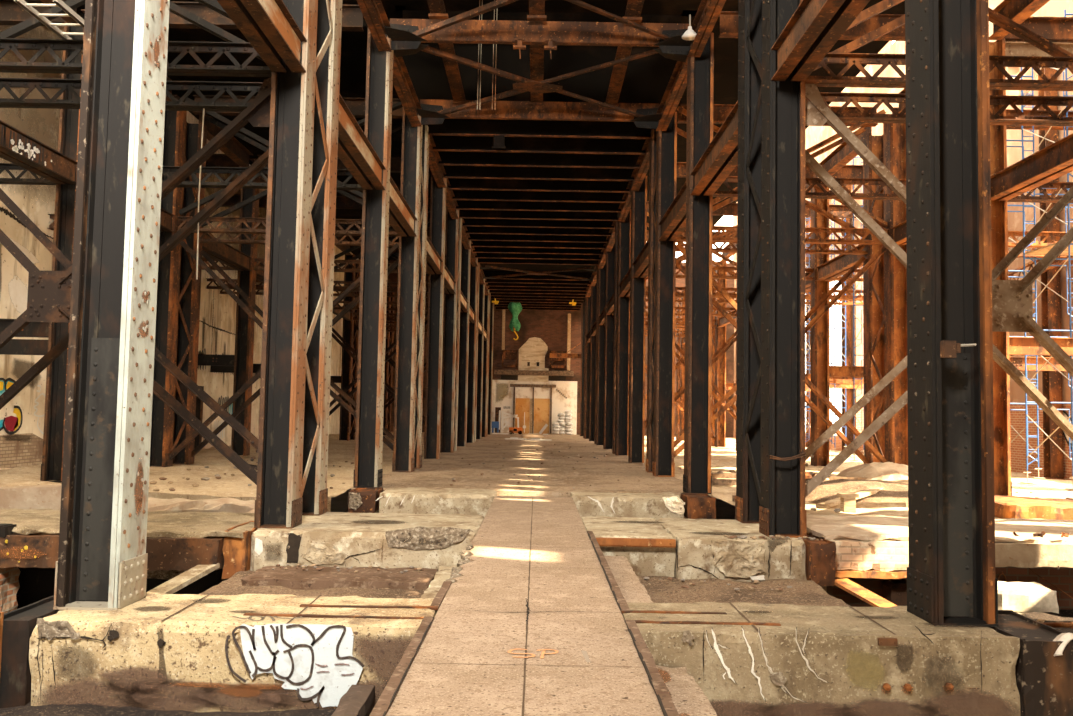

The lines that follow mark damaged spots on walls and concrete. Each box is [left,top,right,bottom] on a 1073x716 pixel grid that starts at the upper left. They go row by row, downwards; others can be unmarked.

rust [138,322,148,337]
spalling [385,526,470,550]
damp [706,629,1015,716]